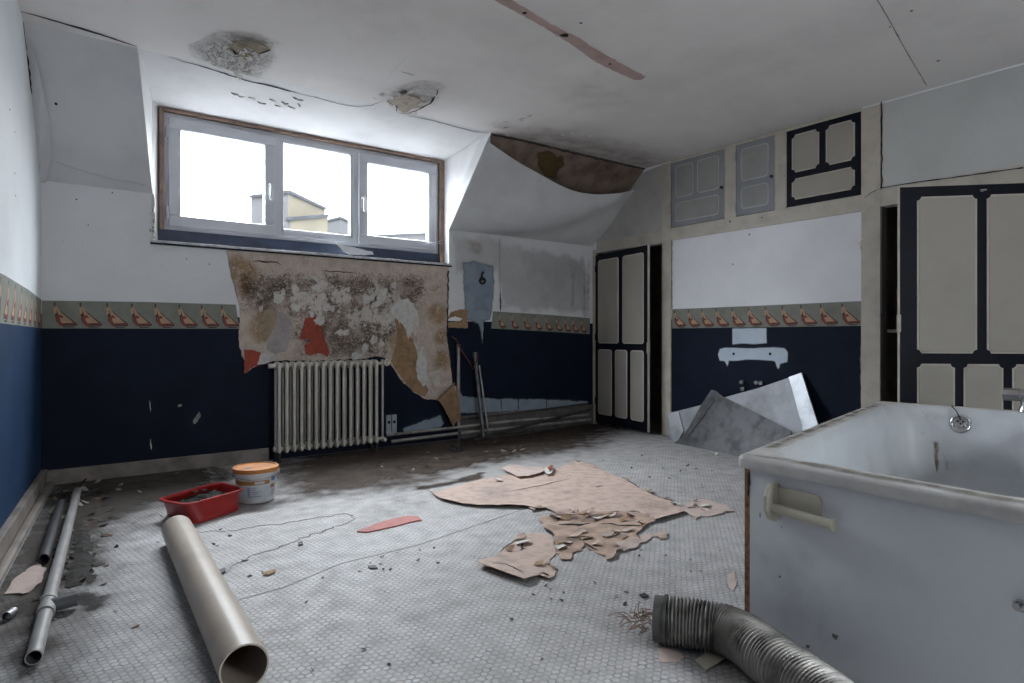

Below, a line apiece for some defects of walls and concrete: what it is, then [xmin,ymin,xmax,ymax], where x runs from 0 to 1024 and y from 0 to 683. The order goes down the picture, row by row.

crack [170,51,409,107]
spalling [372,71,445,114]
peeling [257,284,350,364]
peeling [335,282,429,397]
peeling [403,415,444,432]